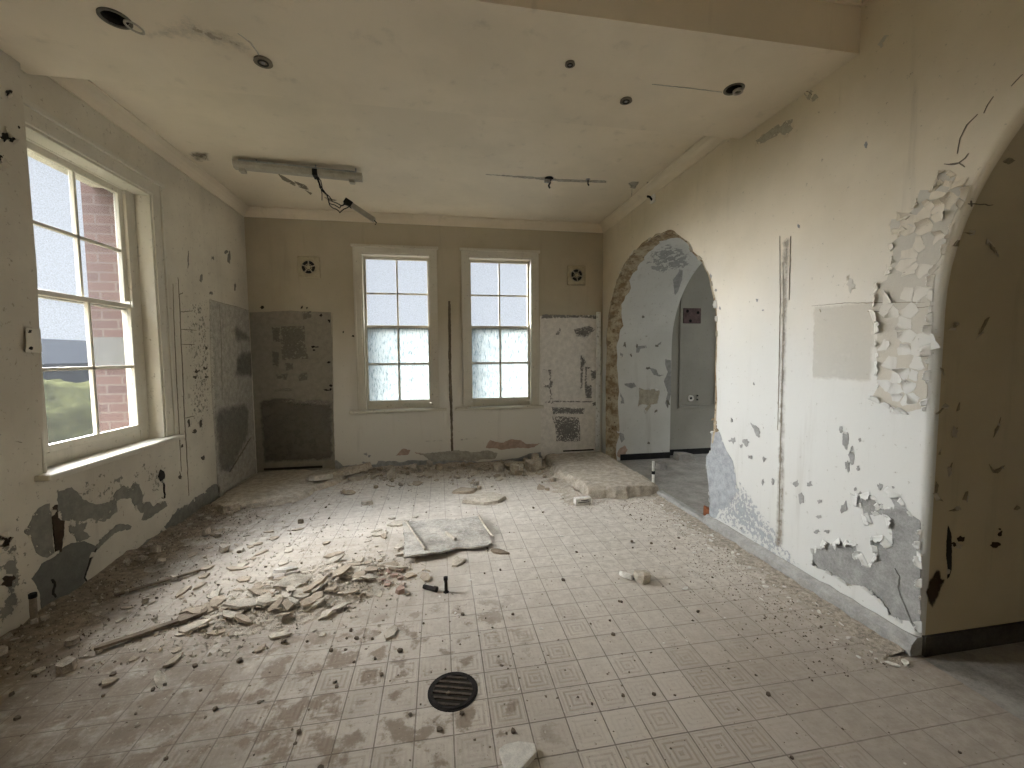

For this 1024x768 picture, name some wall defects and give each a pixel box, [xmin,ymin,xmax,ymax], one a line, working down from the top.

crack [945,74,1023,167]
peeling [868,170,976,415]
flaking render [0,230,800,622]
flaking render [810,483,923,634]